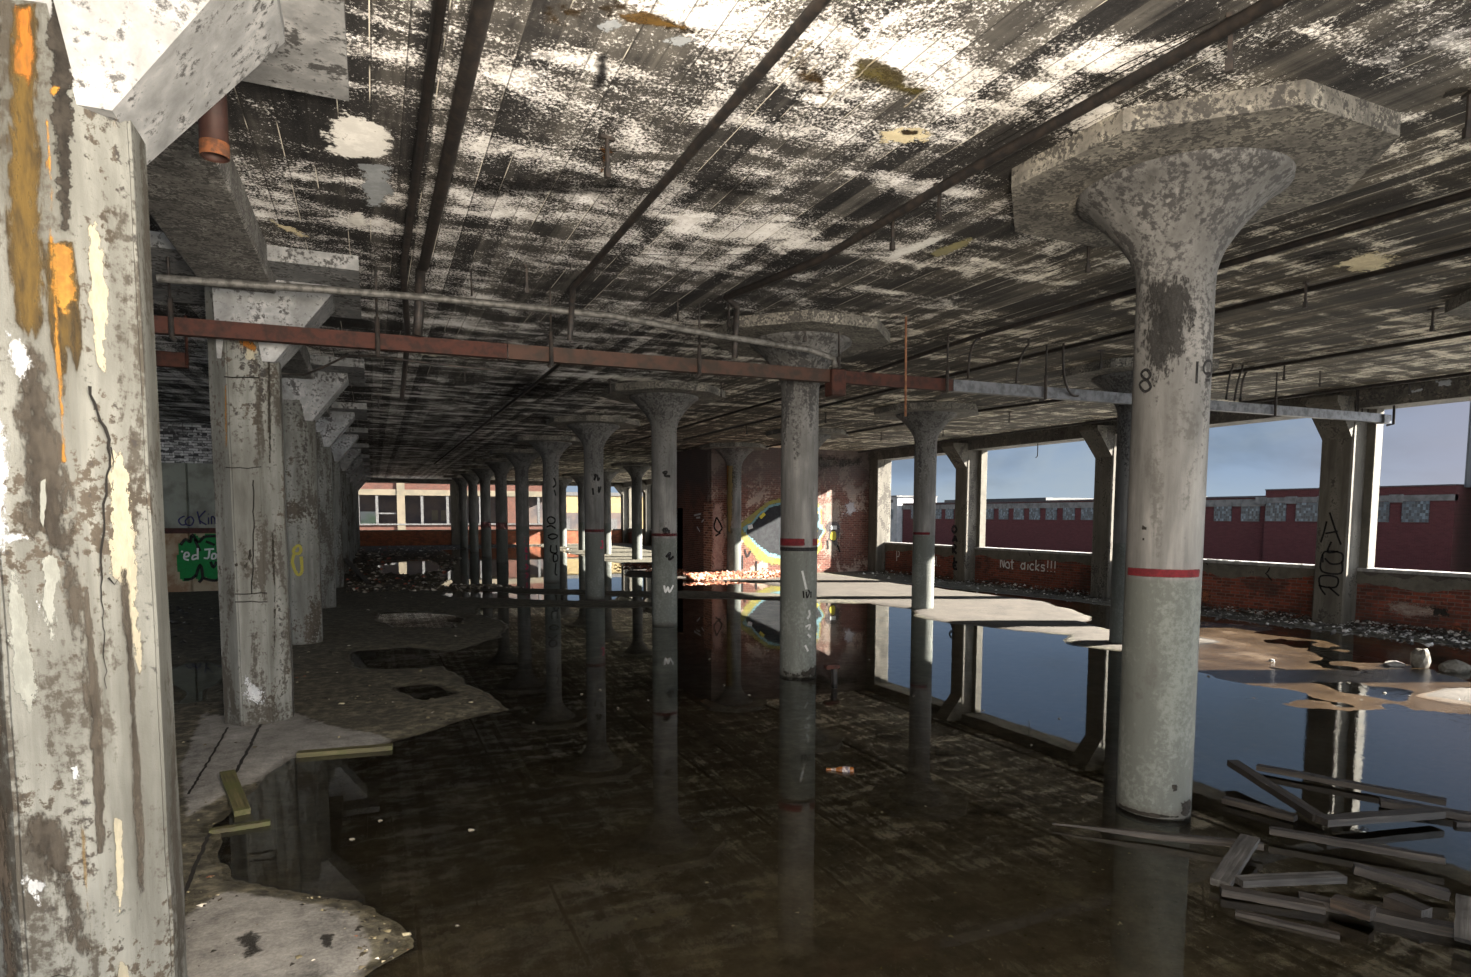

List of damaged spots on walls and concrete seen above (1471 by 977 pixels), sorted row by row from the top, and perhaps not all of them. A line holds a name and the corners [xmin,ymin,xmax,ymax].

water stain [545,0,717,47]
water stain [776,40,931,108]
peeling [320,112,394,227]
water stain [881,234,973,260]
peeling [87,221,110,372]
rust [239,341,258,360]
peeling [6,346,84,712]
peeling [108,449,145,913]
water stain [241,677,265,705]
water stain [21,588,106,956]
peeling [118,961,129,977]
water stain [237,931,262,958]